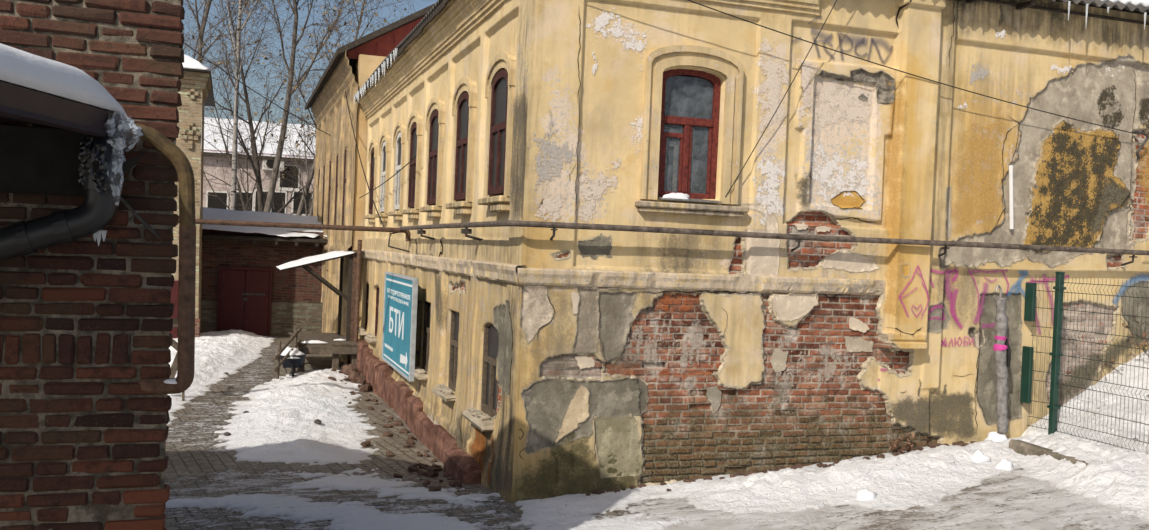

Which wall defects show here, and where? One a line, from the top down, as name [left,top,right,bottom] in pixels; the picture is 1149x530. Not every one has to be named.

crack [569,16,581,213]
peeling [527,109,624,260]
peeling [580,5,649,75]
flaking render [728,42,895,276]
flaking render [939,54,1149,271]
leakage [1020,84,1149,254]
flaking render [493,285,944,486]